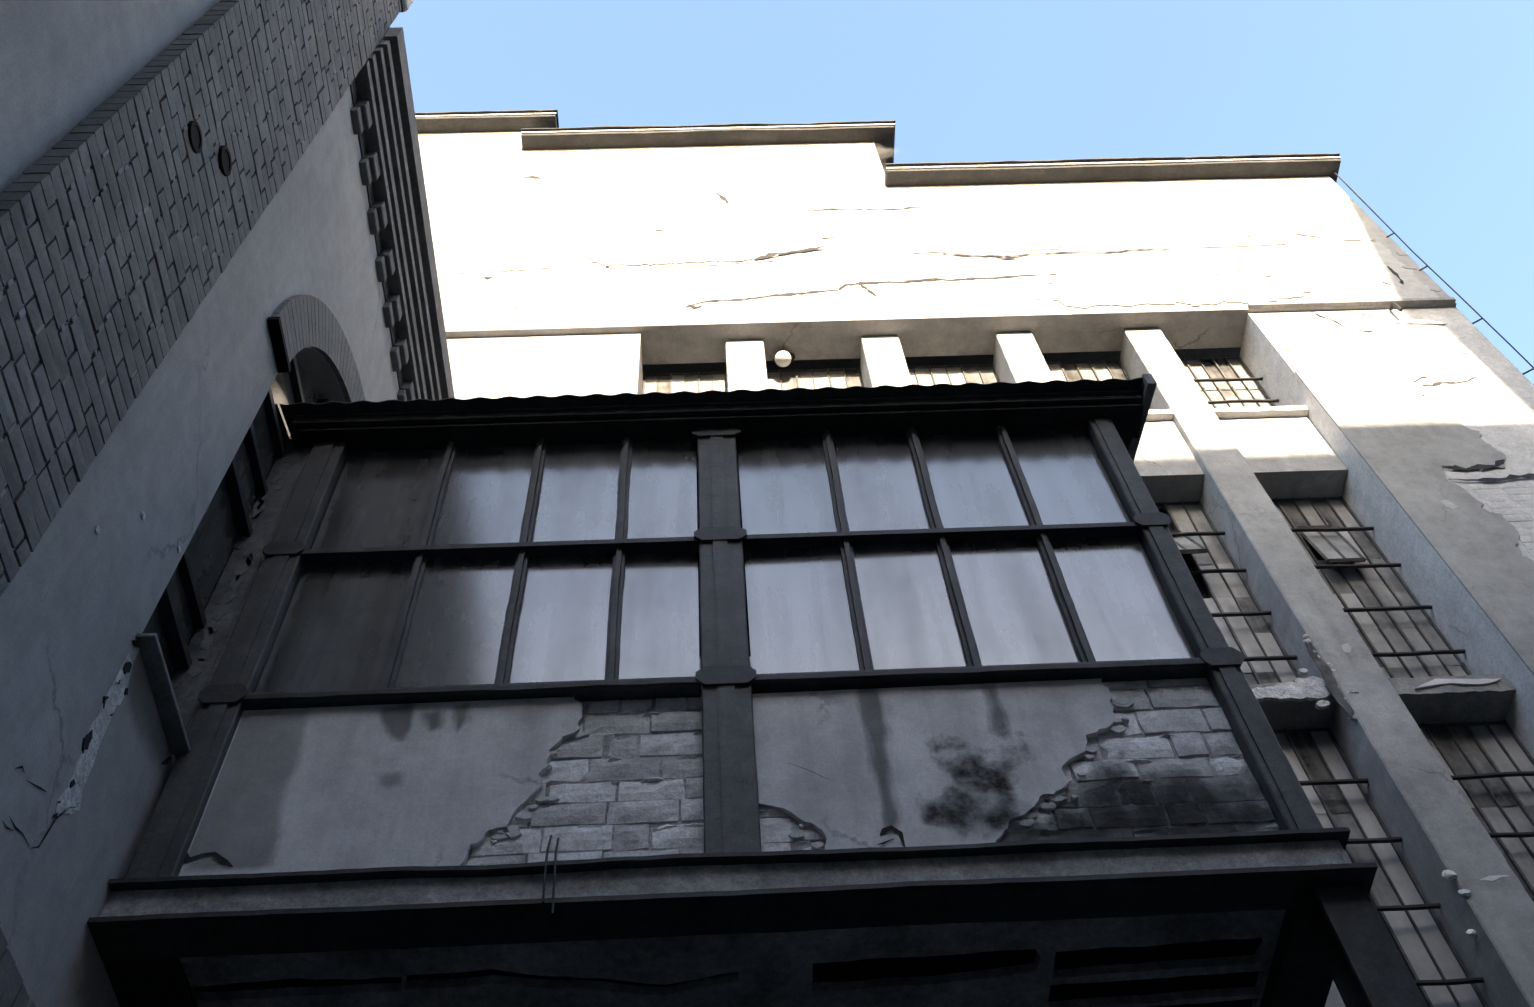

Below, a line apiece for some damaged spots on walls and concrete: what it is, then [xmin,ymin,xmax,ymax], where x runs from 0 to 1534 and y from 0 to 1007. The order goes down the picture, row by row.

flaking render [693,271,1083,323]
flaking render [1228,235,1442,301]
flaking render [1467,481,1534,558]
crack [3,765,76,849]
flaking render [52,640,140,820]
flaking render [466,697,704,865]
flaking render [759,806,826,852]
mould [923,757,1275,841]
flaking render [1000,678,1279,842]